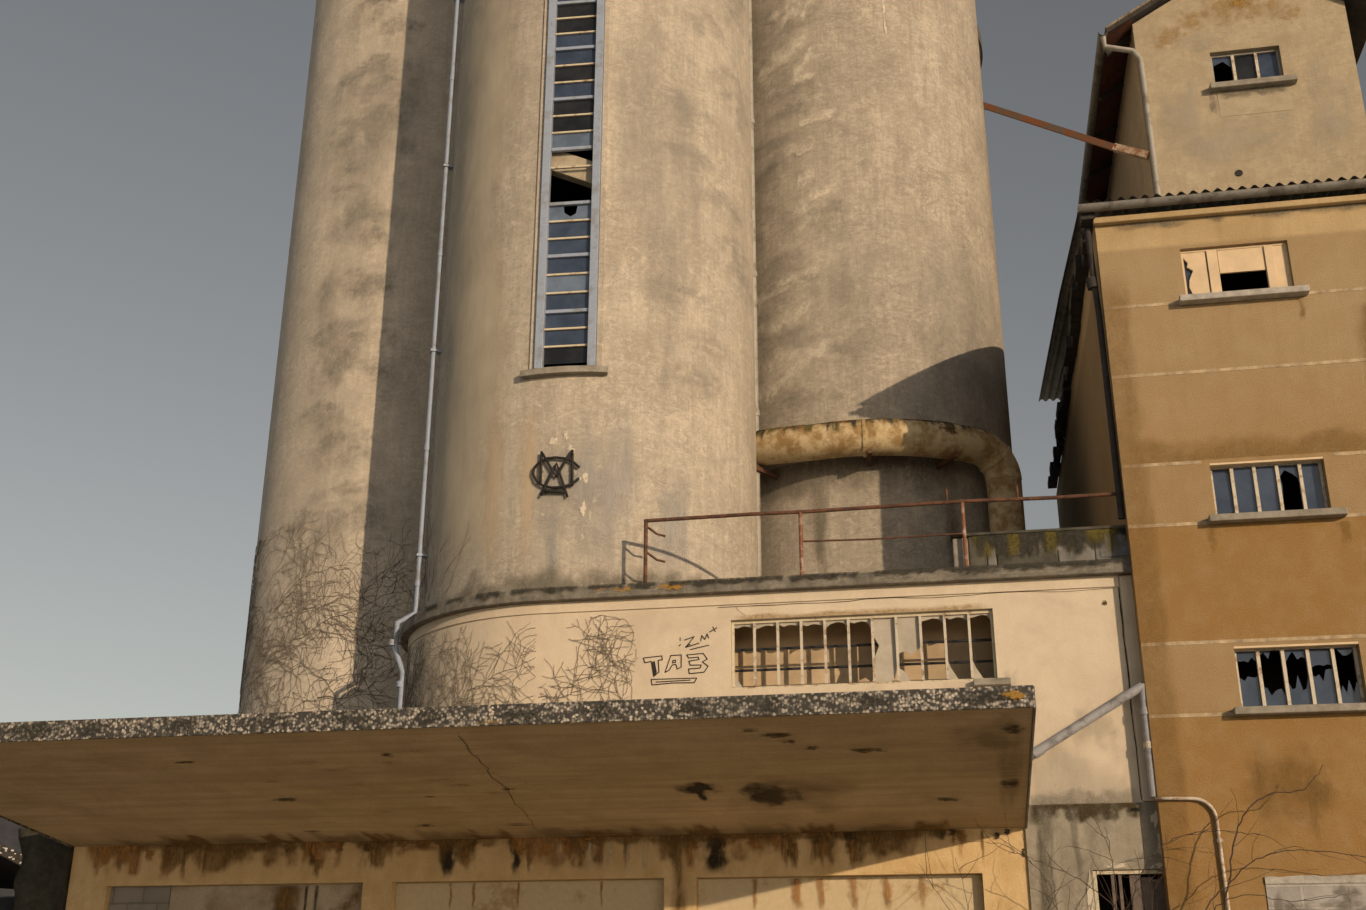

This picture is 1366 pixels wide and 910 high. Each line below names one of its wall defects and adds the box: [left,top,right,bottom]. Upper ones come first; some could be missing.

damp [765,456,947,500]
damp [90,829,984,910]